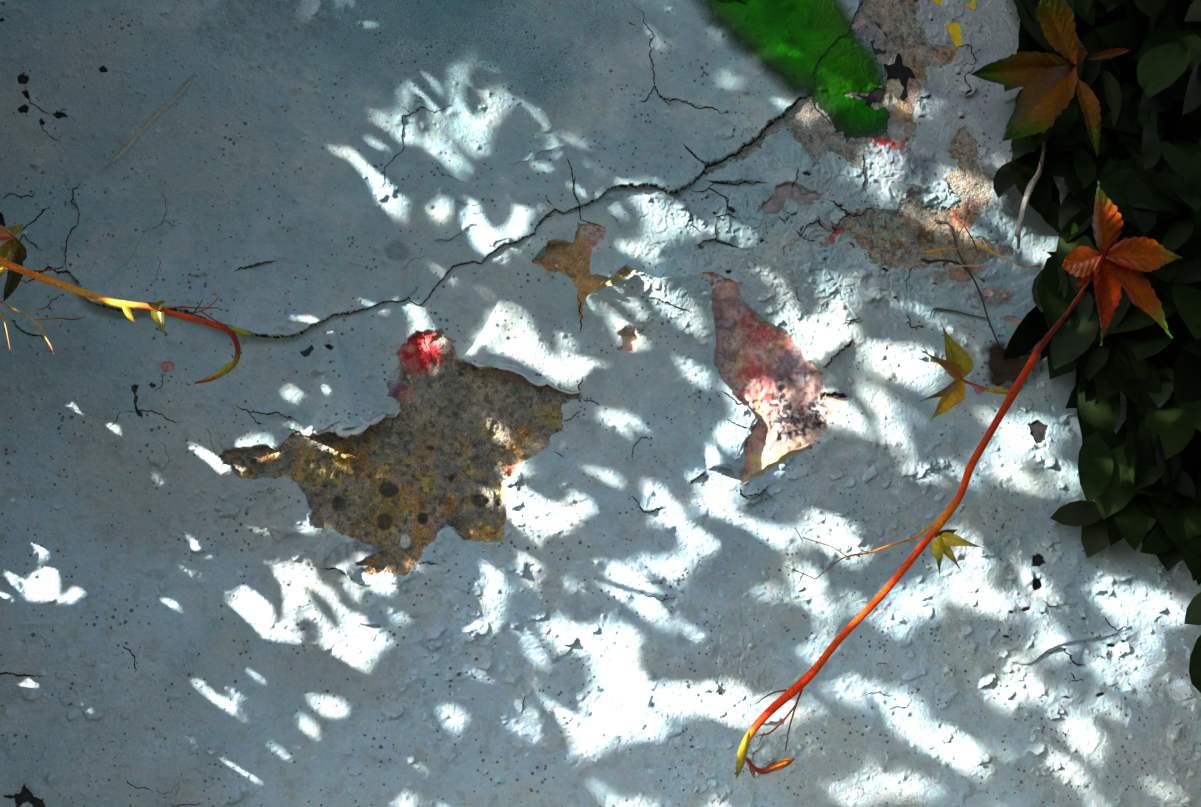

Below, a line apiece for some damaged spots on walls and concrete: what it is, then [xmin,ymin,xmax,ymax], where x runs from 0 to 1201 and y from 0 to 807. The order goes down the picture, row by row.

crack [25,86,66,141]
crack [4,180,134,339]
crack [151,194,206,334]
crack [236,261,278,271]
peeling [220,329,582,576]
crack [251,0,873,339]
peeling [532,223,639,318]
peeling [692,270,842,485]
crack [796,285,863,398]
peeling [703,0,961,247]
peeling [819,116,1014,298]